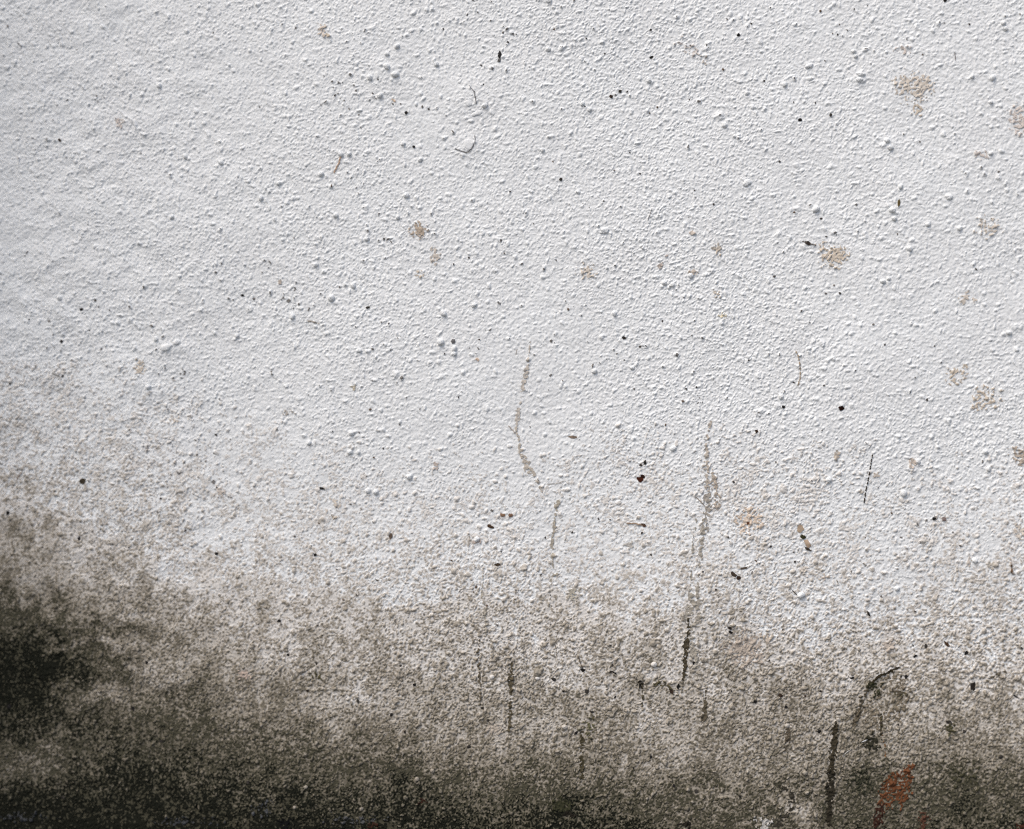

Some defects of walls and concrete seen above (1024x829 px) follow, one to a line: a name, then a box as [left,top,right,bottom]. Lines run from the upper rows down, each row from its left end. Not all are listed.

damp [0,421,1024,829]
rust [872,762,915,829]